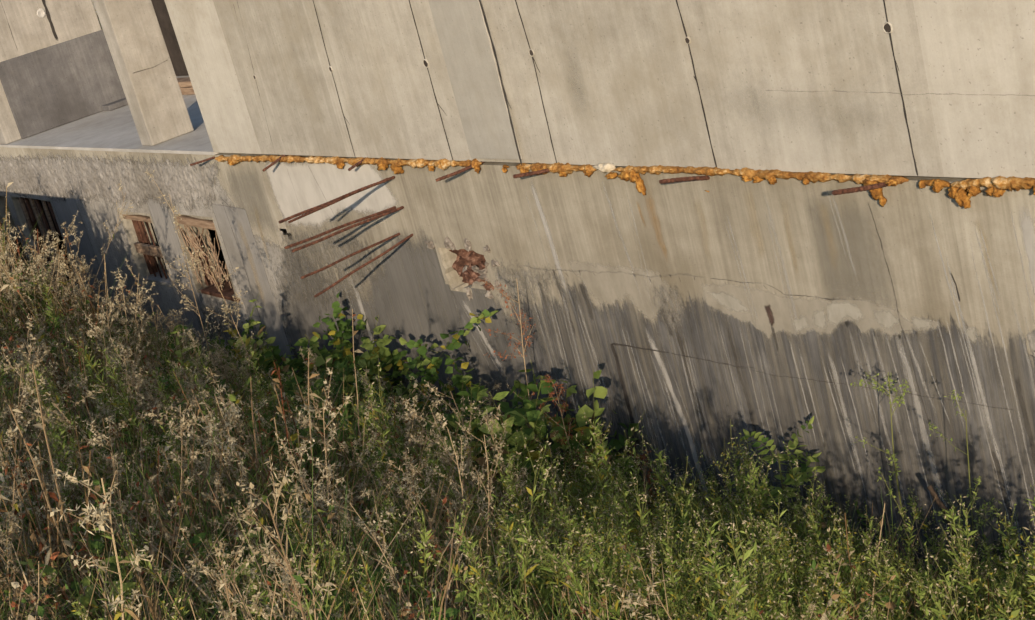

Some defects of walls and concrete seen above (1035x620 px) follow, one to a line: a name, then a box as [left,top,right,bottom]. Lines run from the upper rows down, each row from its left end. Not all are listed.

spalling [278,176,395,224]
spalling [276,206,413,307]
spalling [425,236,558,304]
water stain [282,186,1035,605]
crack [611,343,878,423]